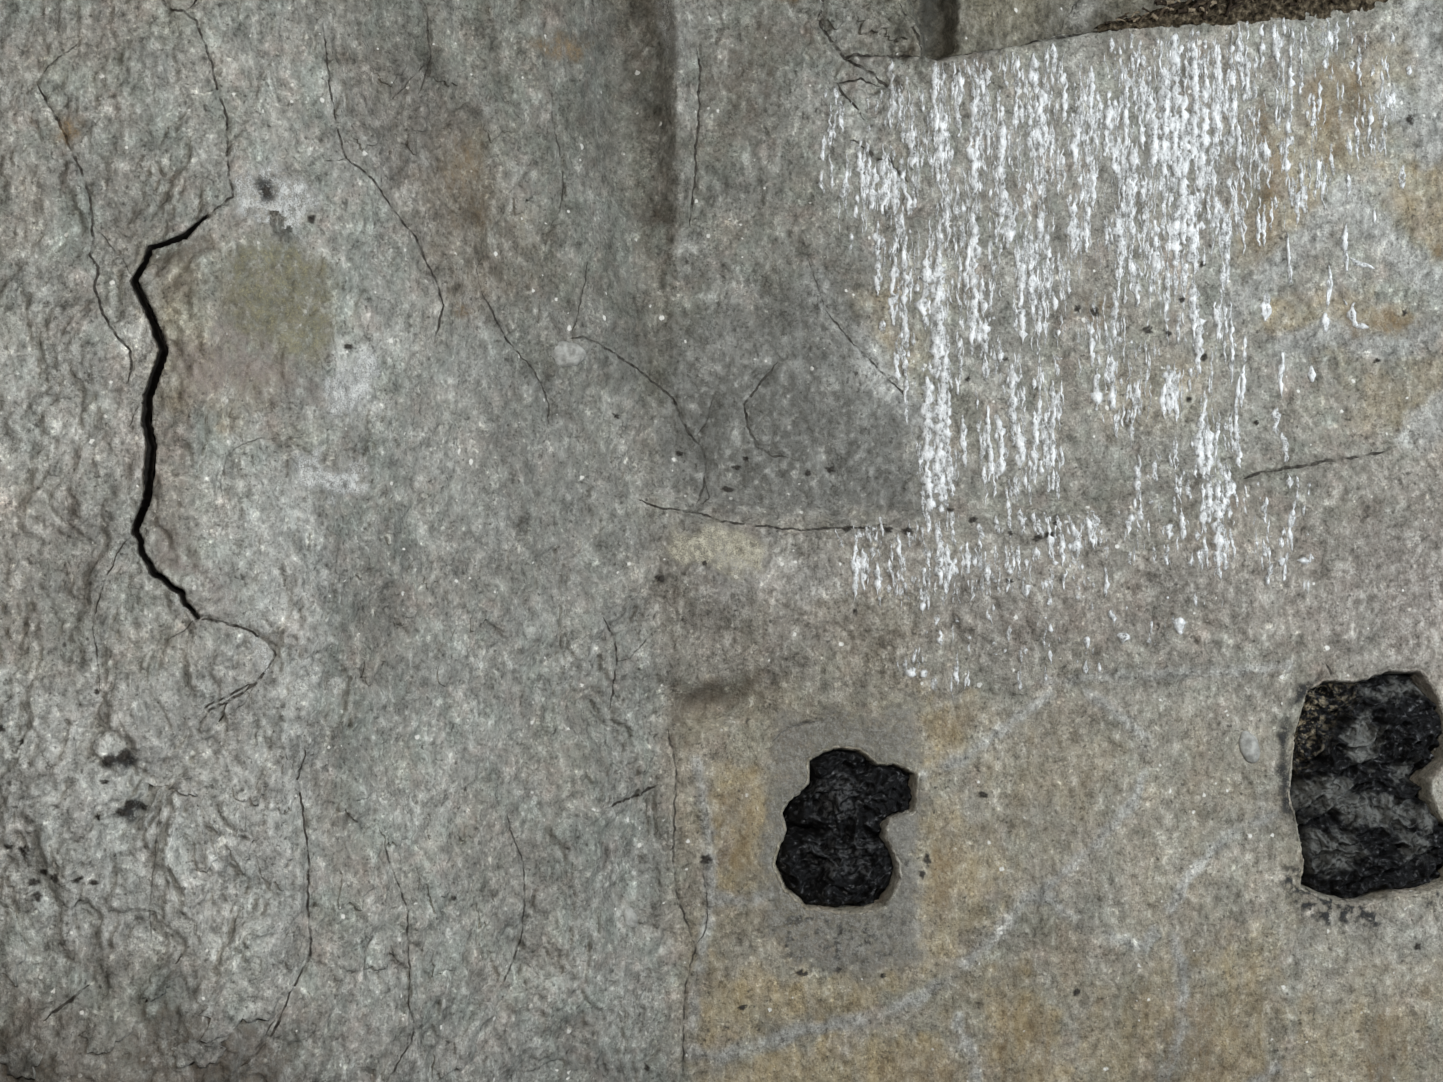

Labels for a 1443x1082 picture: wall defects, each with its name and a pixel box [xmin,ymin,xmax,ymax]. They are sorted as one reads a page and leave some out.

crack [38,0,277,724]
damp [817,17,1396,697]
hole [772,745,931,944]
hole [1287,668,1443,909]